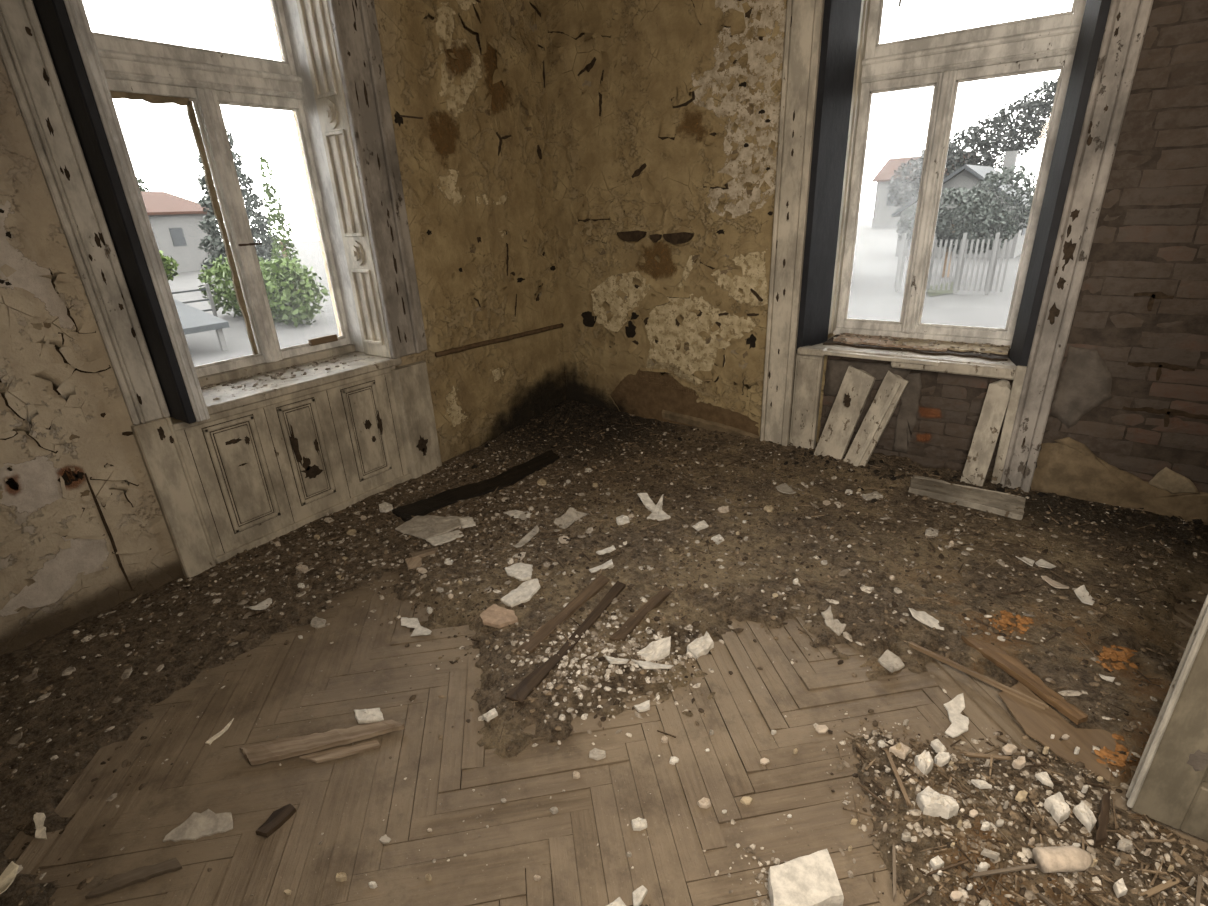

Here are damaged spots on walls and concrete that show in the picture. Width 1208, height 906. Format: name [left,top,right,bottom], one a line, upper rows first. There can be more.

leakage [444,41,513,114]
leakage [429,111,459,165]
flaking render [691,0,795,234]
flaking render [0,191,96,351]
peeling [89,232,107,285]
flaking render [581,243,786,439]
leakage [488,369,625,441]
flaking render [0,456,91,513]
flaking render [0,533,113,622]